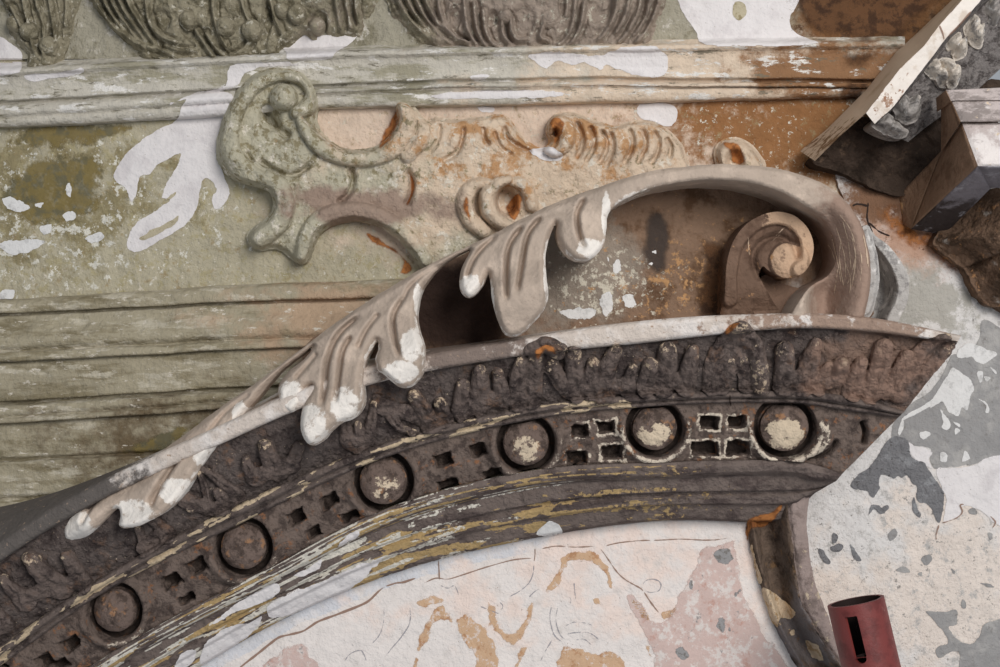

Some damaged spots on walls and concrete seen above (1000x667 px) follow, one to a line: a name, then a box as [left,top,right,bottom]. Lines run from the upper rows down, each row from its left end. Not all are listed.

peeling [678,0,818,47]
peeling [431,74,564,112]
peeling [528,46,668,78]
peeling [114,35,357,252]
corrosion [380,112,398,147]
corrosion [724,142,744,164]
corrosion [367,233,411,274]
spalling [851,319,1000,523]
peeling [175,557,383,667]
peeling [413,596,533,667]
peeling [627,541,787,667]
spalling [926,599,1000,667]